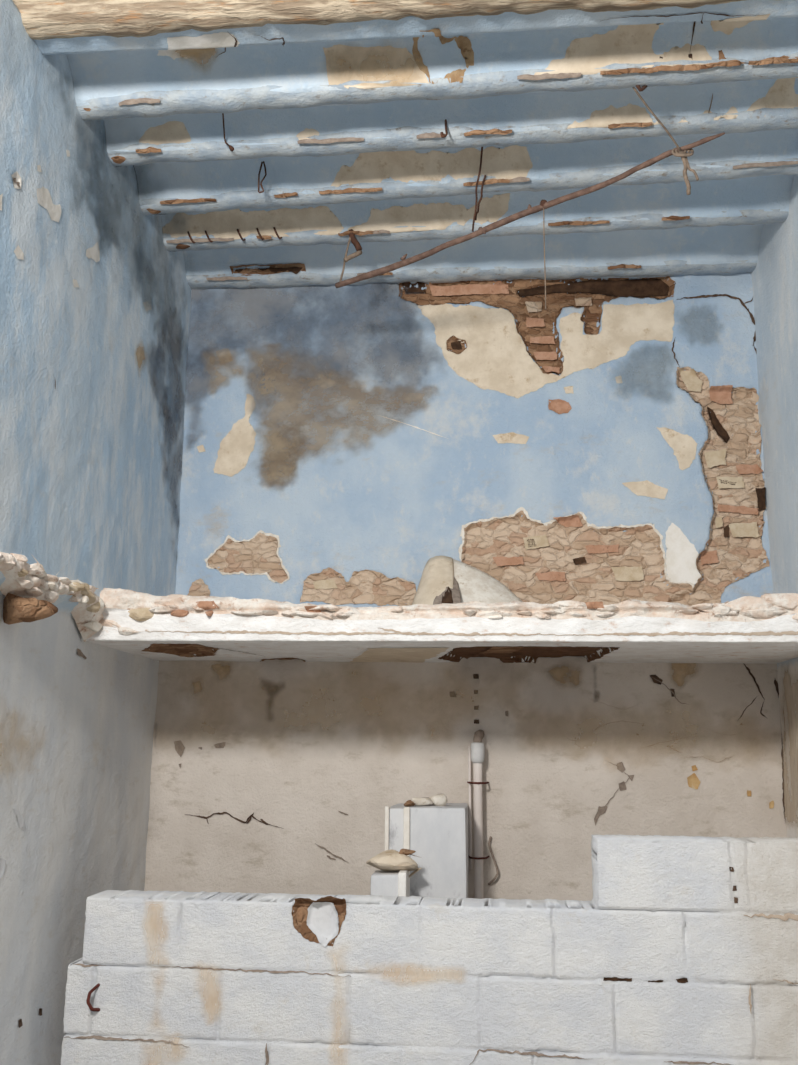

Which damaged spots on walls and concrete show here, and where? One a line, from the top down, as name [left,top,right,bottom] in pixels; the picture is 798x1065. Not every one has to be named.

peeling [323,44,430,89]
peeling [534,23,727,75]
peeling [331,145,533,187]
water stain [105,165,427,524]
peeling [398,276,676,414]
flaking render [458,367,770,609]
flaking render [188,530,290,611]
flaking render [300,567,416,612]
crack [185,812,284,829]
spalling [292,896,346,947]